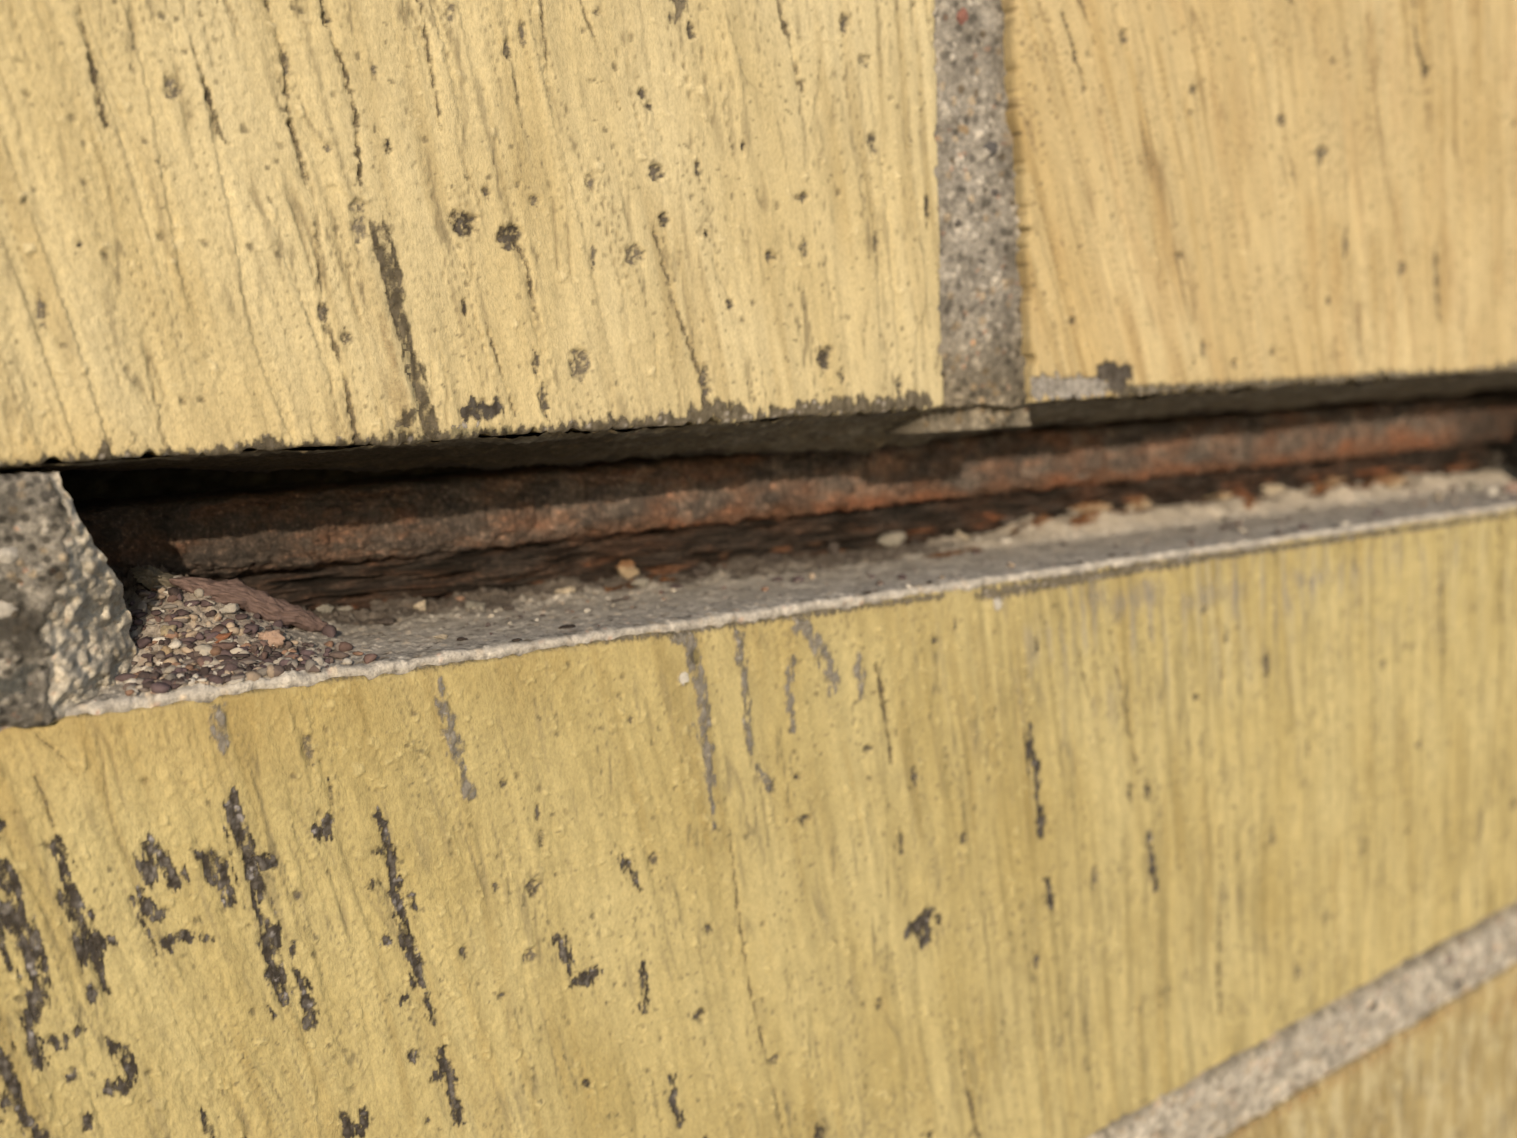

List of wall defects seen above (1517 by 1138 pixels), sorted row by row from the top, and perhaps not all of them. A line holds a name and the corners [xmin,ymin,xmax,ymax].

spalling [42,472,137,721]